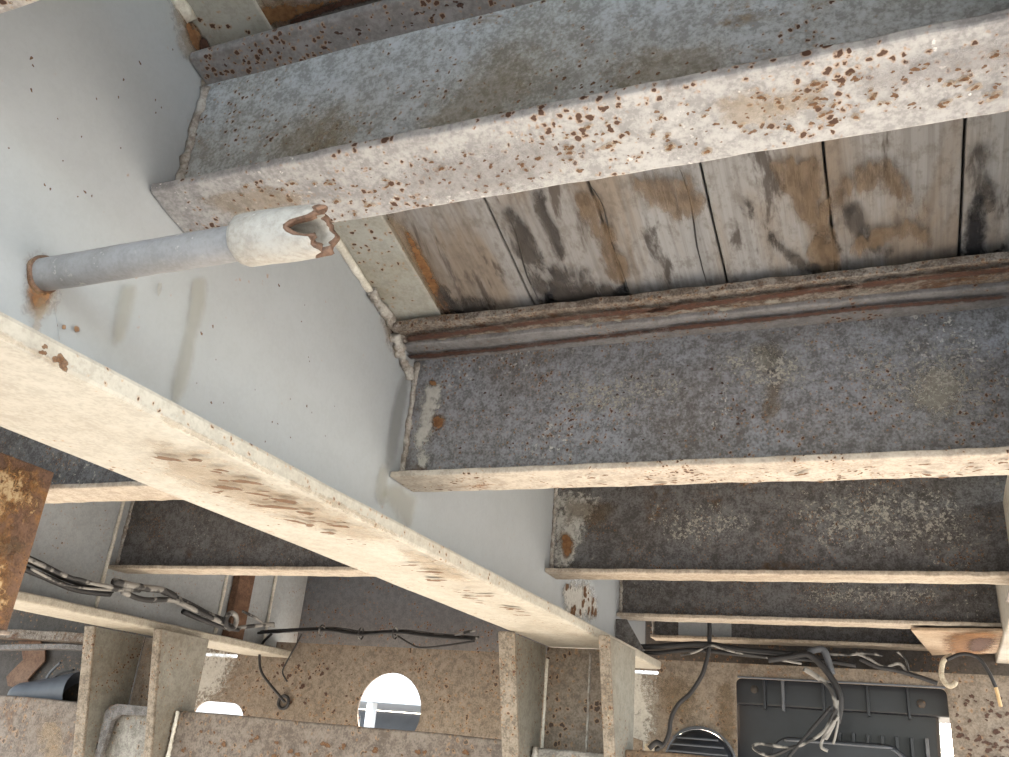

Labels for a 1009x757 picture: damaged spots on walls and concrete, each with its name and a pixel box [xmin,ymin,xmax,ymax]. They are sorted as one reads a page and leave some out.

rust [864,62,930,105]
damp [634,176,706,220]
damp [769,157,932,274]
damp [961,146,1005,256]
rust [405,232,450,313]
rust [28,285,51,309]
rust [404,268,1009,341]
rust [408,296,1008,359]
rust [432,415,446,437]
rust [561,533,573,559]
rust [271,740,346,757]